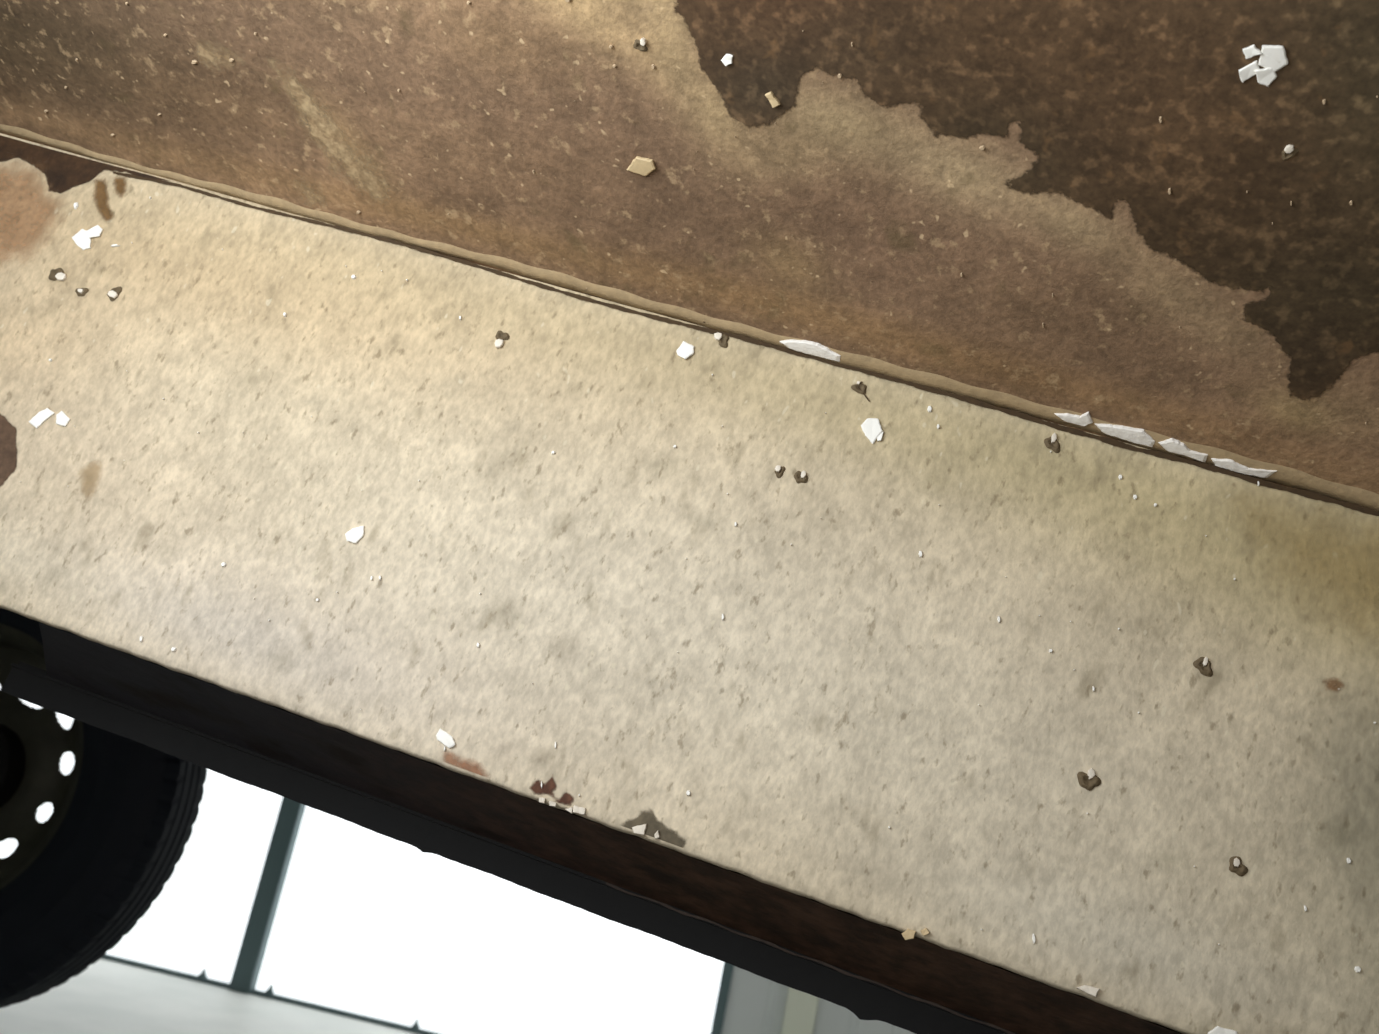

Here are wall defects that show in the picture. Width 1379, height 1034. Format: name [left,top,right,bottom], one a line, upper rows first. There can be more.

peeling [1239,45,1288,87]
peeling [765,91,781,108]
water stain [0,135,169,221]
peeling [676,341,694,359]
peeling [861,418,884,444]
peeling [1095,423,1277,478]
peeling [539,797,586,815]
peeling [632,824,660,839]